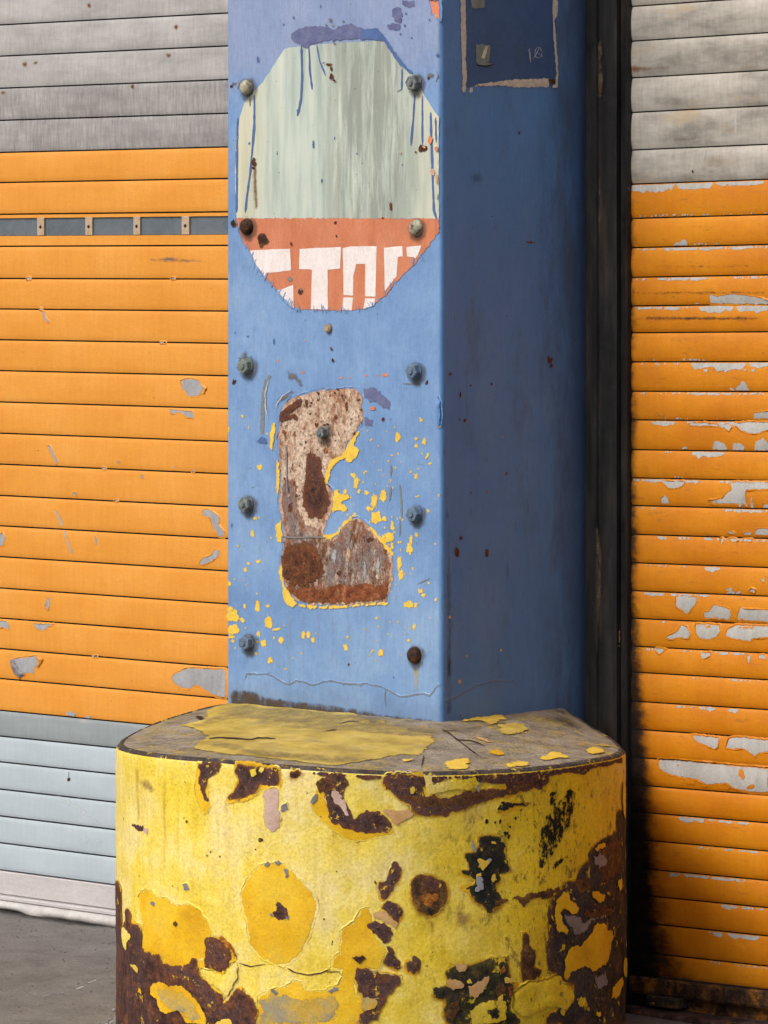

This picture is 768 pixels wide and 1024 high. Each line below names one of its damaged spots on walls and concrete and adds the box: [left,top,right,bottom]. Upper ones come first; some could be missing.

peeling [652,409,768,459]
corrosion [276,386,396,608]
peeling [279,406,437,661]
peeling [644,577,768,665]
crack [244,672,440,705]
corrosion [223,761,343,833]
peeling [310,771,395,843]
peeling [657,733,768,796]
corrosion [115,878,259,1024]
peeling [138,882,241,1001]
peeling [239,860,389,1024]
corrosion [354,757,627,1024]